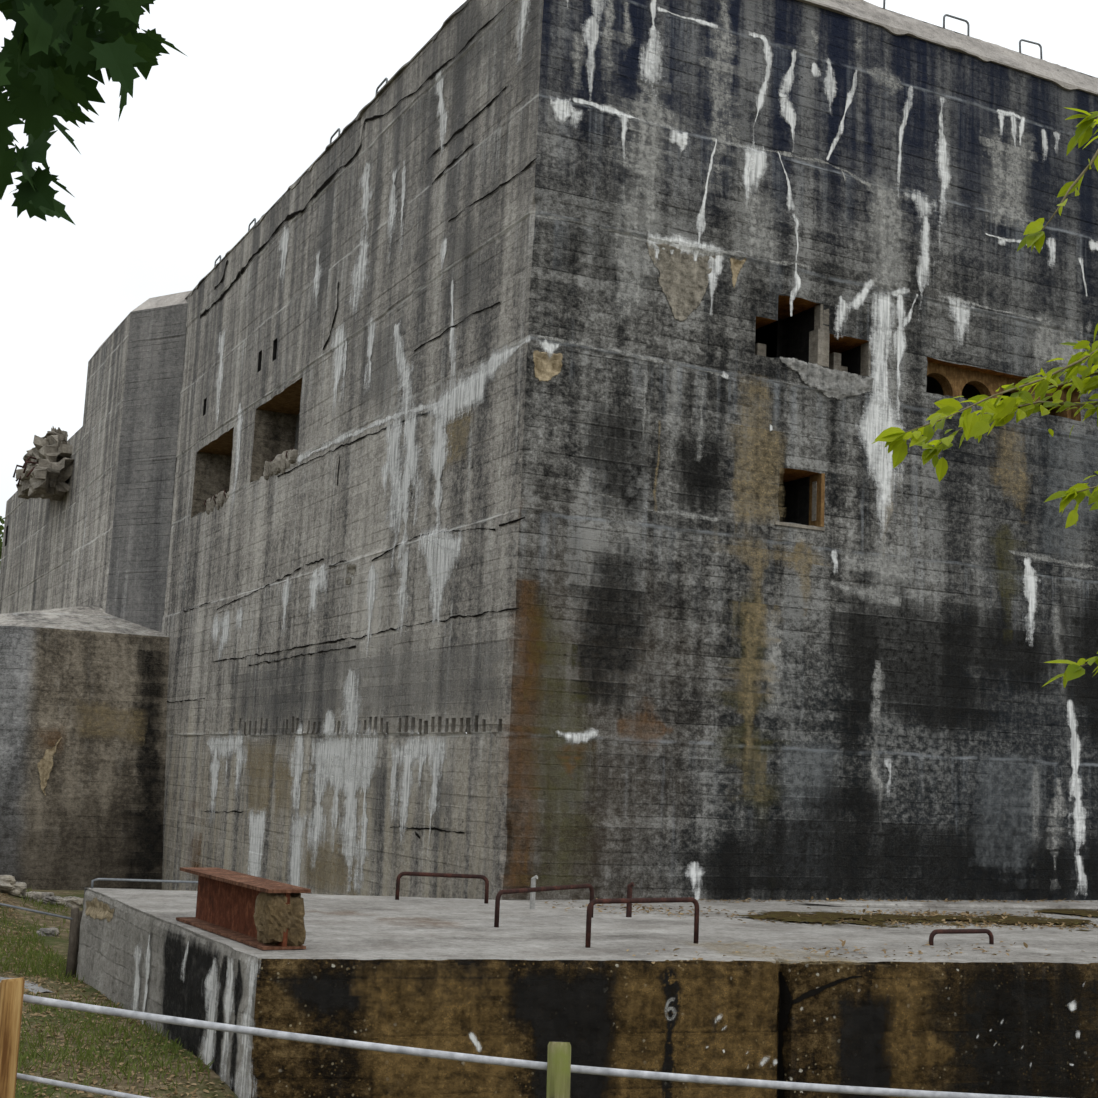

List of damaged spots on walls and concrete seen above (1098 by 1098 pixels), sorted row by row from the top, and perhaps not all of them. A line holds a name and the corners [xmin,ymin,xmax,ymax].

crack [200,0,513,318]
water stain [615,0,736,317]
water stain [779,50,796,137]
crack [323,282,339,350]
spalling [533,340,563,382]
spalling [646,242,746,321]
water stain [836,71,950,525]
crack [213,608,519,666]
water stain [208,670,378,895]
water stain [688,526,1098,901]
water stain [274,947,812,1098]
water stain [833,962,1098,1098]